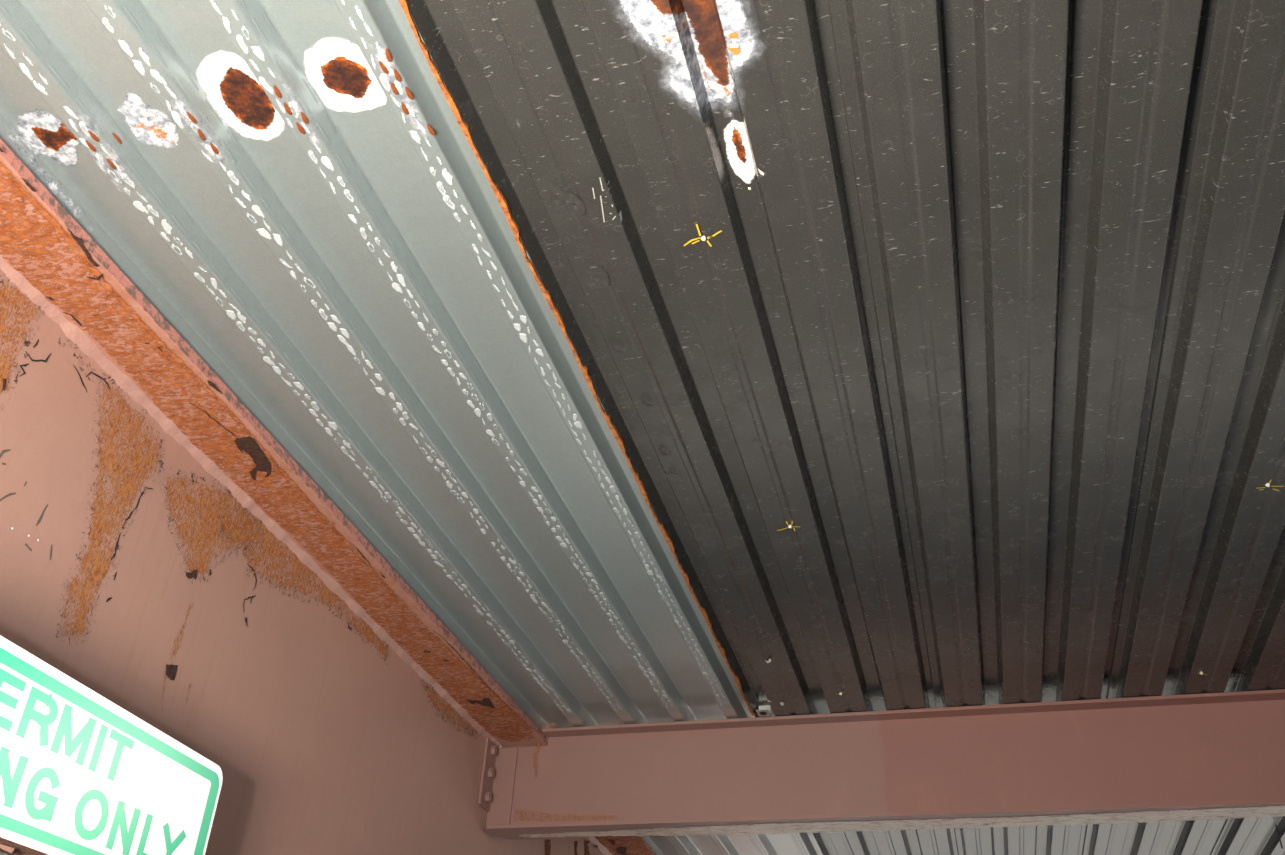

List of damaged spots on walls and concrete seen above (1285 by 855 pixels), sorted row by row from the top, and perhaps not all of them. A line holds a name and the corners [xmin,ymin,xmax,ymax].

rust [618,0,760,183]
spalling [67,229,99,267]
rust [0,0,726,760]
peeling [234,436,272,480]
rust [569,836,657,855]